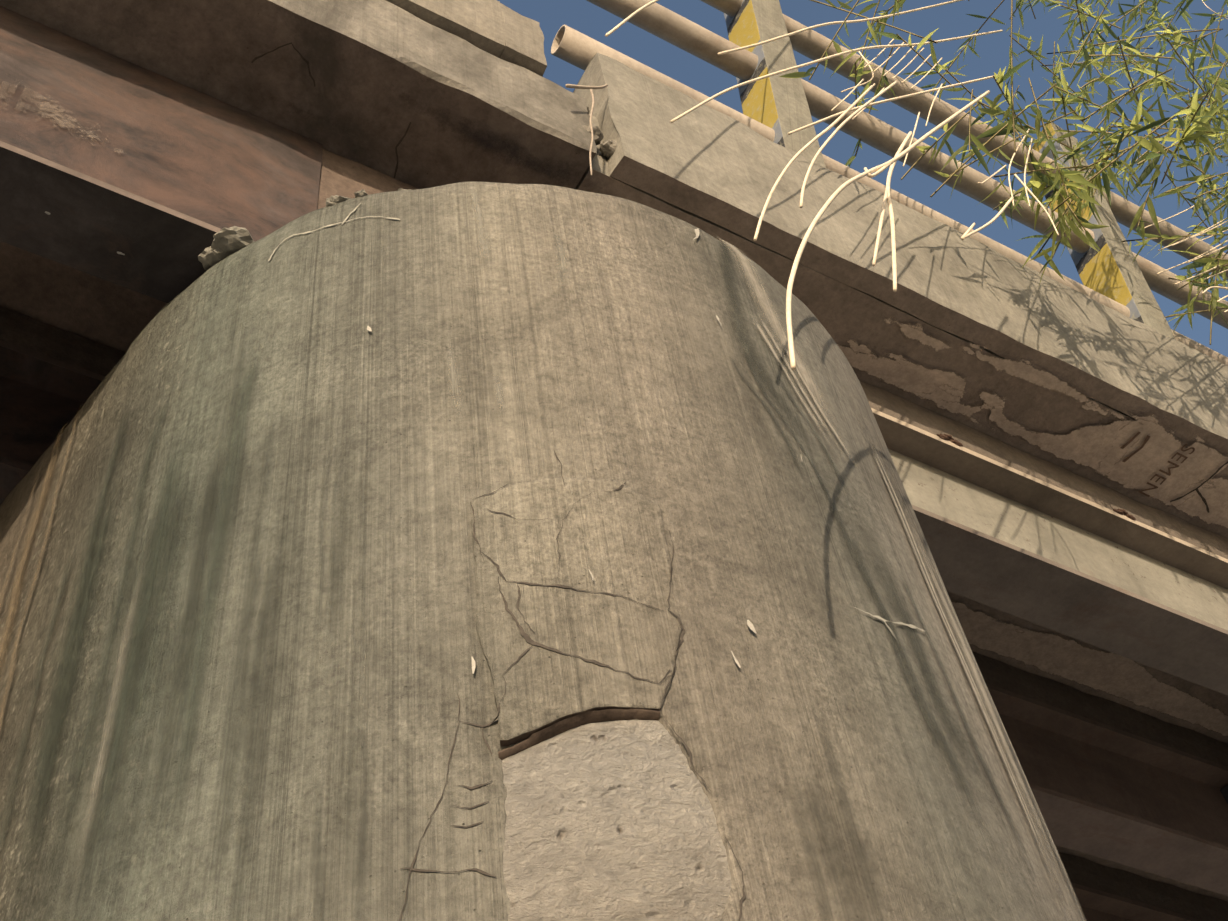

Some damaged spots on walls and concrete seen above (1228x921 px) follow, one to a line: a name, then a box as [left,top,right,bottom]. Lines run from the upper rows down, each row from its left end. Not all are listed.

peeling [837,319,1228,528]
crack [399,451,711,921]
flaking render [498,708,732,921]
crack [725,837,746,921]